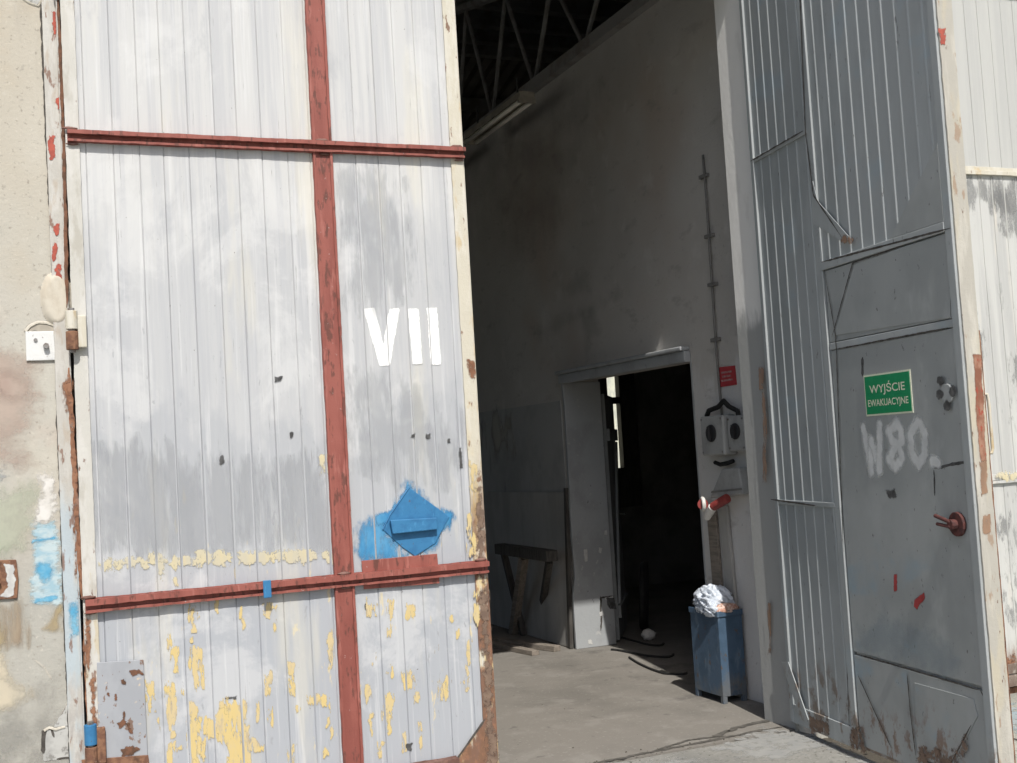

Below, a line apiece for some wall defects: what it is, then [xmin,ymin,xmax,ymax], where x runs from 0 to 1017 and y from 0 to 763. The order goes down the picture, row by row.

rust [57,0,69,308]
peeling [967,178,1017,235]
rust [973,354,1017,495]
rust [62,368,83,600]
peeling [98,549,333,586]
rust [476,486,487,560]
peeling [365,597,416,637]
peeling [144,605,274,763]
peeling [287,661,334,759]
peeling [365,664,423,759]
rust [479,575,499,763]
rust [807,712,830,735]